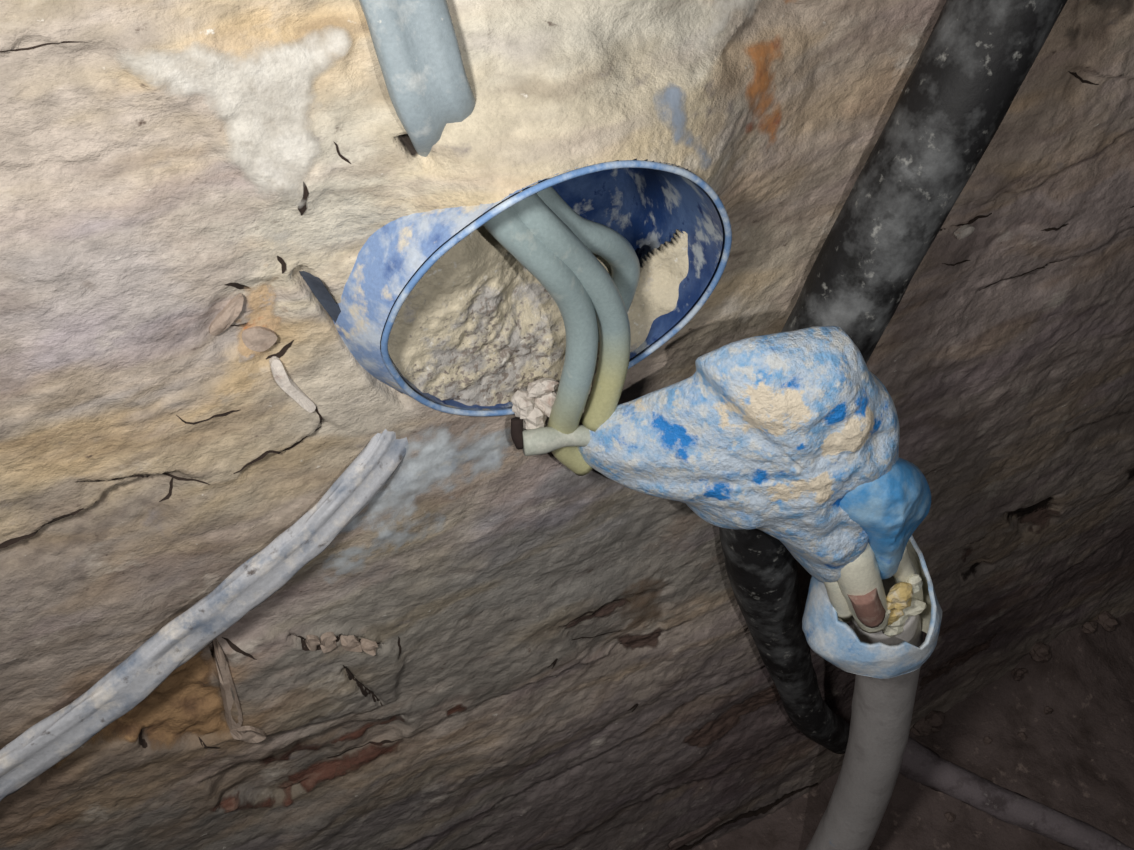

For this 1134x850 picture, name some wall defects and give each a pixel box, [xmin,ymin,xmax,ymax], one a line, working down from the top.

crack [0,41,88,52]
rust [748,43,781,139]
peeling [209,283,316,413]
crack [0,405,323,549]
spalling [1007,497,1059,533]
spalling [563,581,662,649]
spalling [90,638,266,749]
spalling [447,705,466,716]
spalling [213,716,404,813]